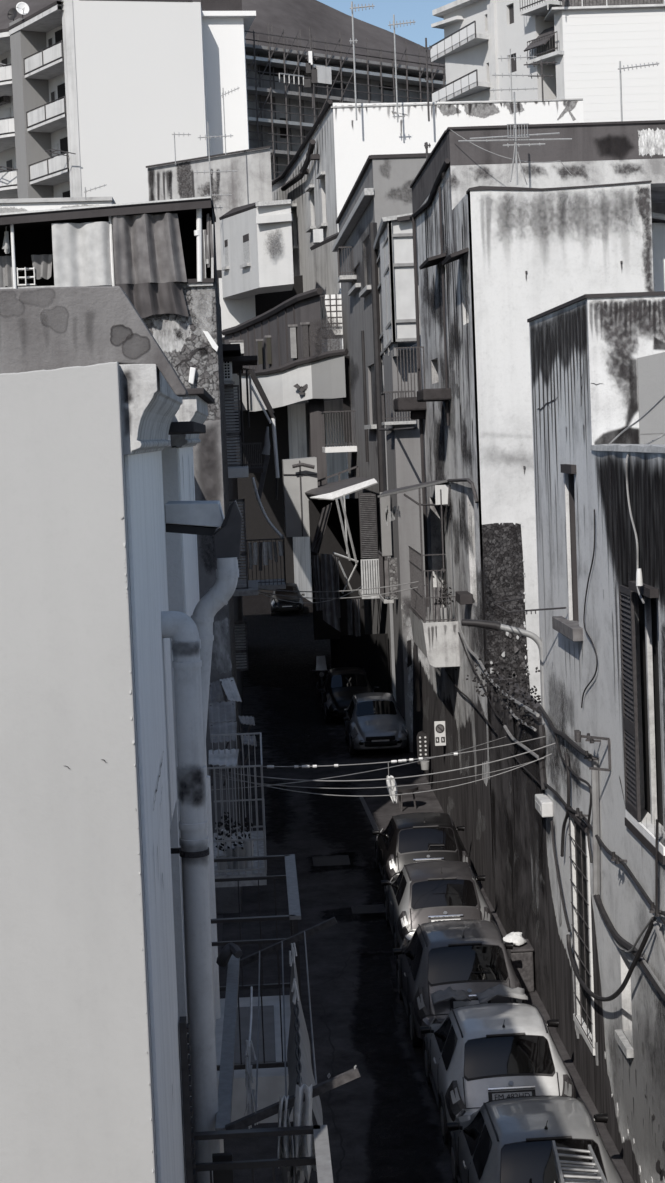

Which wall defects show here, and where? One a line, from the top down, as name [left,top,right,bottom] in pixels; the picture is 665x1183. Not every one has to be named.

damp [110,325,150,431]
flaking render [152,318,191,353]
damp [531,300,665,711]
peeling [401,521,530,911]